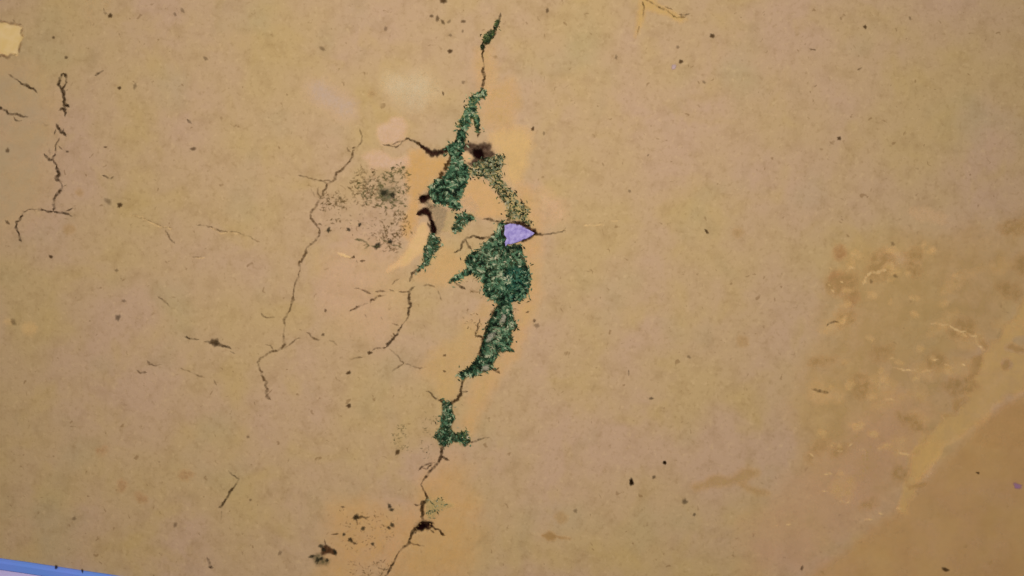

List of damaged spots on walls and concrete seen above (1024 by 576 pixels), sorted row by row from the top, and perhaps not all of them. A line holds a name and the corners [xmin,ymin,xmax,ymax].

peeling [0,23,23,57]
crack [481,15,501,91]
crack [15,73,72,241]
spalling [462,143,495,165]
mould [347,164,412,235]
peeling [392,195,477,268]
crack [388,126,526,289]
peeling [501,221,536,246]
crack [350,271,416,364]
crack [388,310,499,573]